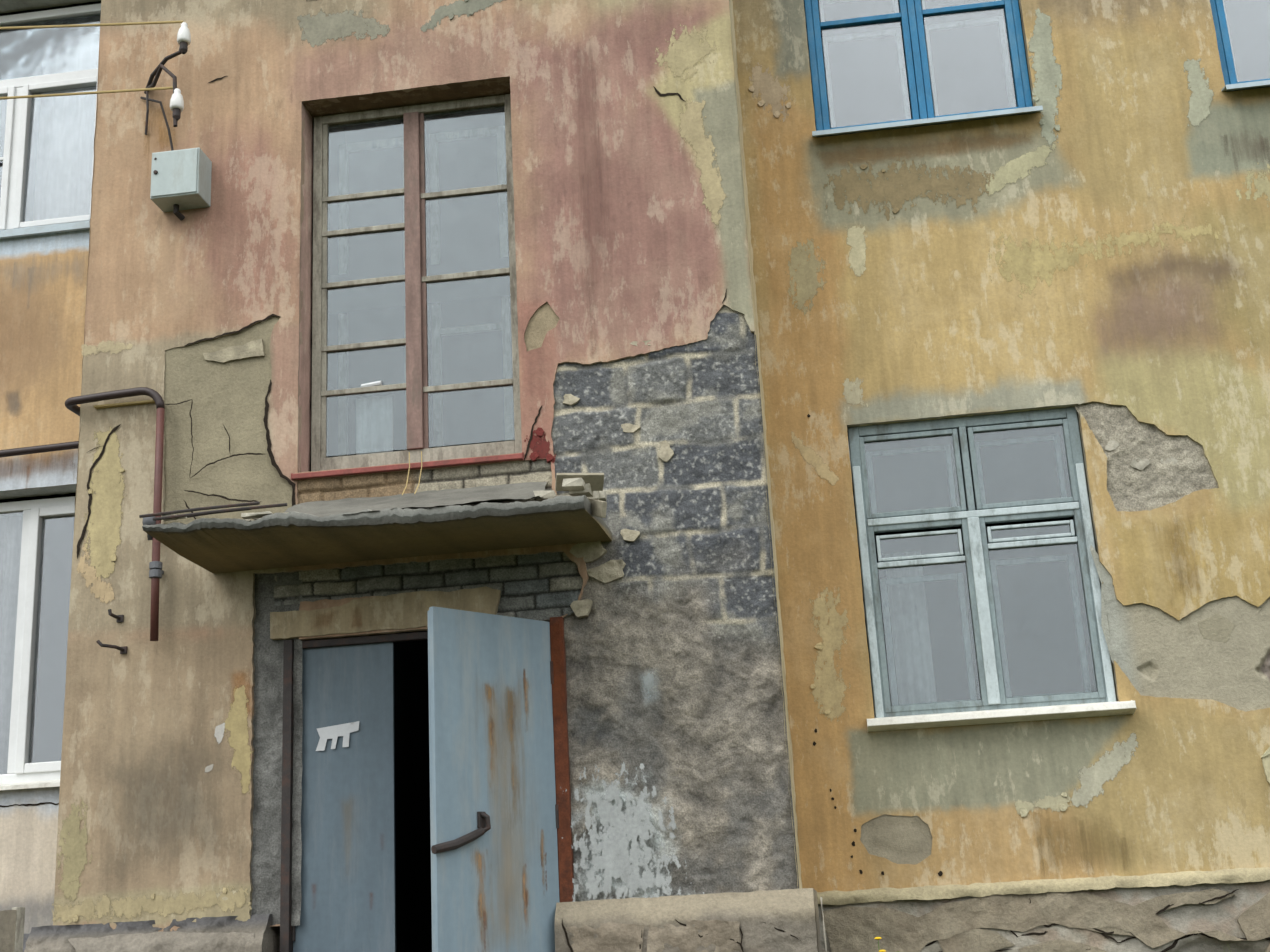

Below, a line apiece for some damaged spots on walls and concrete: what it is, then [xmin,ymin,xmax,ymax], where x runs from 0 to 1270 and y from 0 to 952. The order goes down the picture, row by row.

peeling [420,0,503,32]
peeling [679,99,729,232]
peeling [823,9,1063,277]
crack [77,424,121,559]
spalling [1074,402,1218,512]
spalling [51,302,799,952]
corrosion [486,670,528,761]
peeling [808,587,851,746]
spalling [1090,545,1270,712]
spalling [850,814,932,875]
crack [996,898,1060,951]
crack [1086,889,1270,952]